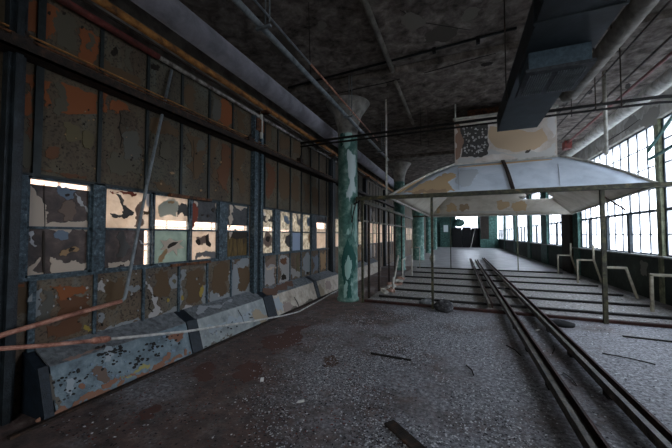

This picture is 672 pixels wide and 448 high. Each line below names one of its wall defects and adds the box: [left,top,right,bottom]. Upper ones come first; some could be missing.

corrosion [61,82,130,114]
peeling [458,116,556,163]
peeling [29,186,88,247]
peeling [110,191,198,228]
peeling [340,132,361,298]
peeling [128,269,193,318]
peeling [201,258,250,304]
peeling [52,345,130,402]
peeling [129,335,180,369]
peeling [227,305,568,448]